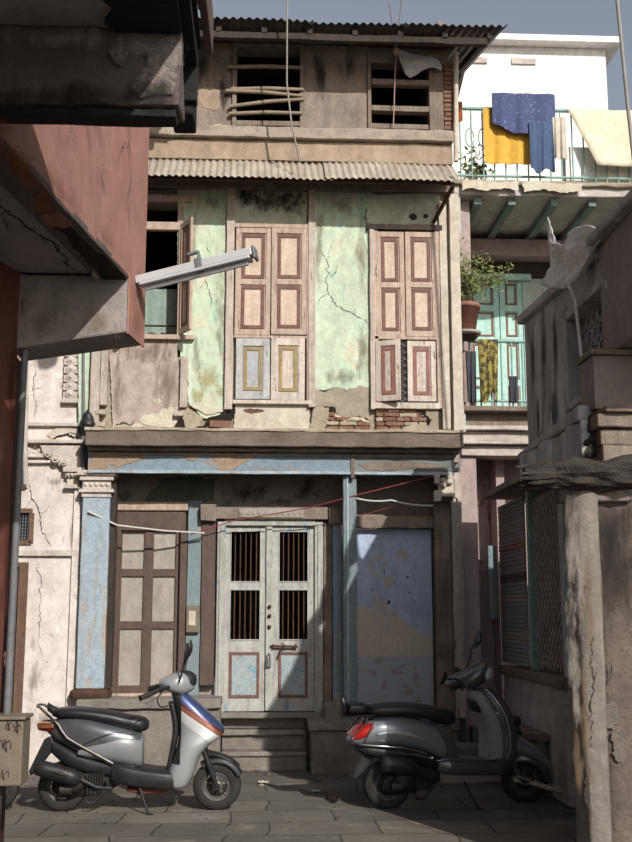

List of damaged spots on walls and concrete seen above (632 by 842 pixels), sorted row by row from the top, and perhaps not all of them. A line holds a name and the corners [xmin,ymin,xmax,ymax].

spalling [96,0,182,98]
water stain [240,191,304,211]
crack [0,199,81,276]
crack [319,242,368,323]
peeling [310,386,438,430]
peeling [91,455,145,469]
crack [26,484,50,544]
peeling [606,701,626,762]